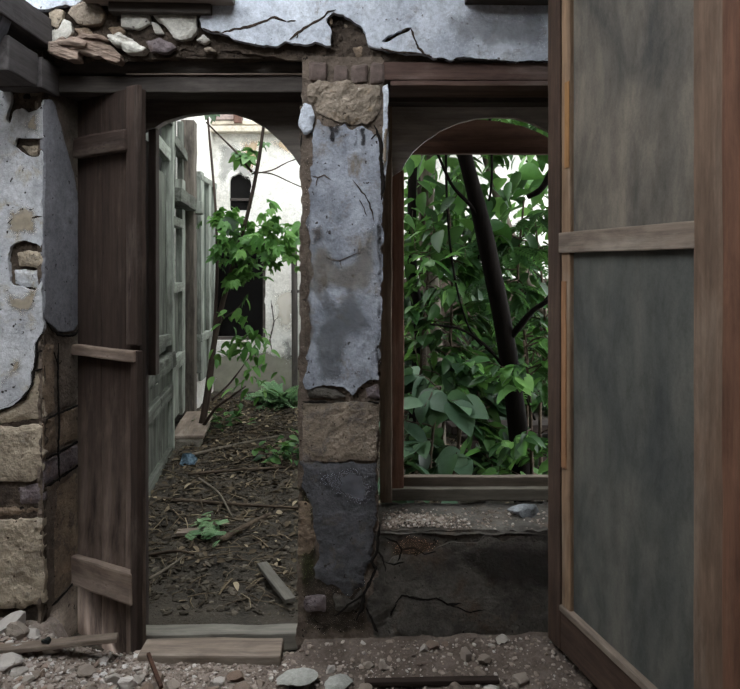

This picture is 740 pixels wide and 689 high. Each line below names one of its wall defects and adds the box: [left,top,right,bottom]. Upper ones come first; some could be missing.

flaking render [48,1,240,66]
crack [203,9,336,40]
flaking render [328,15,347,54]
flaking render [22,146,38,156]
flaking render [9,245,43,309]
crack [334,522,483,632]